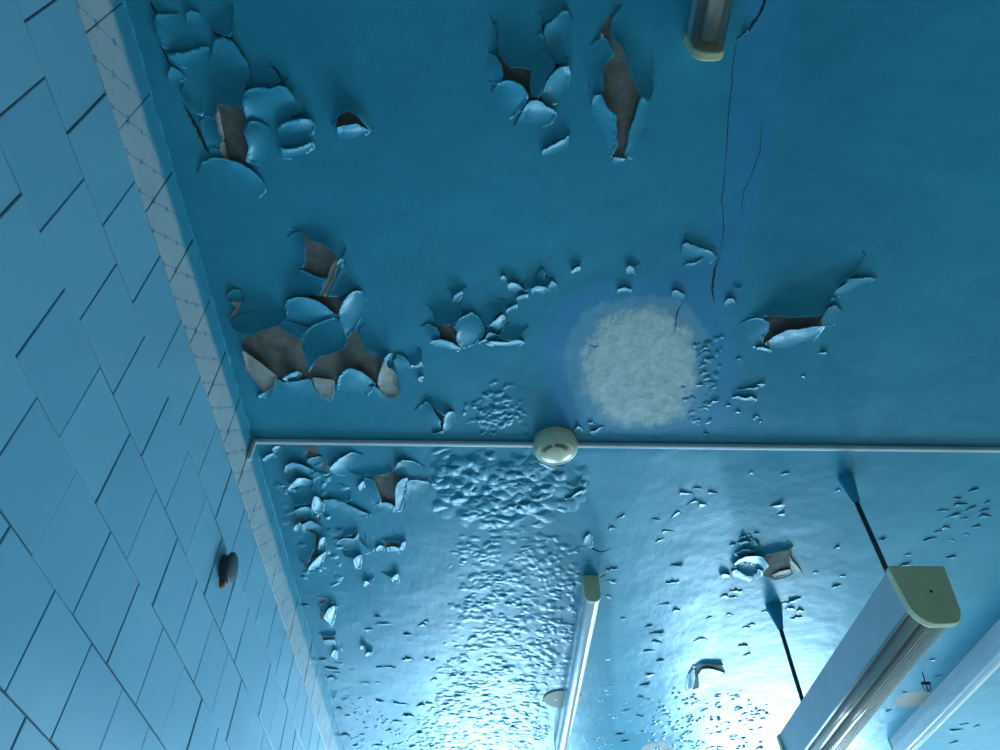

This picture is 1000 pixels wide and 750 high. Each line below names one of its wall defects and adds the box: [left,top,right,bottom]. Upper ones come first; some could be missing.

peeling [152,2,316,197]
peeling [330,96,375,140]
peeling [484,3,574,156]
peeling [584,3,654,165]
crack [711,0,766,304]
peeling [226,223,557,401]
peeling [740,250,876,352]
peeling [415,396,457,436]
peeling [710,383,766,414]
peeling [262,445,432,587]
peeling [720,536,818,599]
peeling [685,659,725,691]